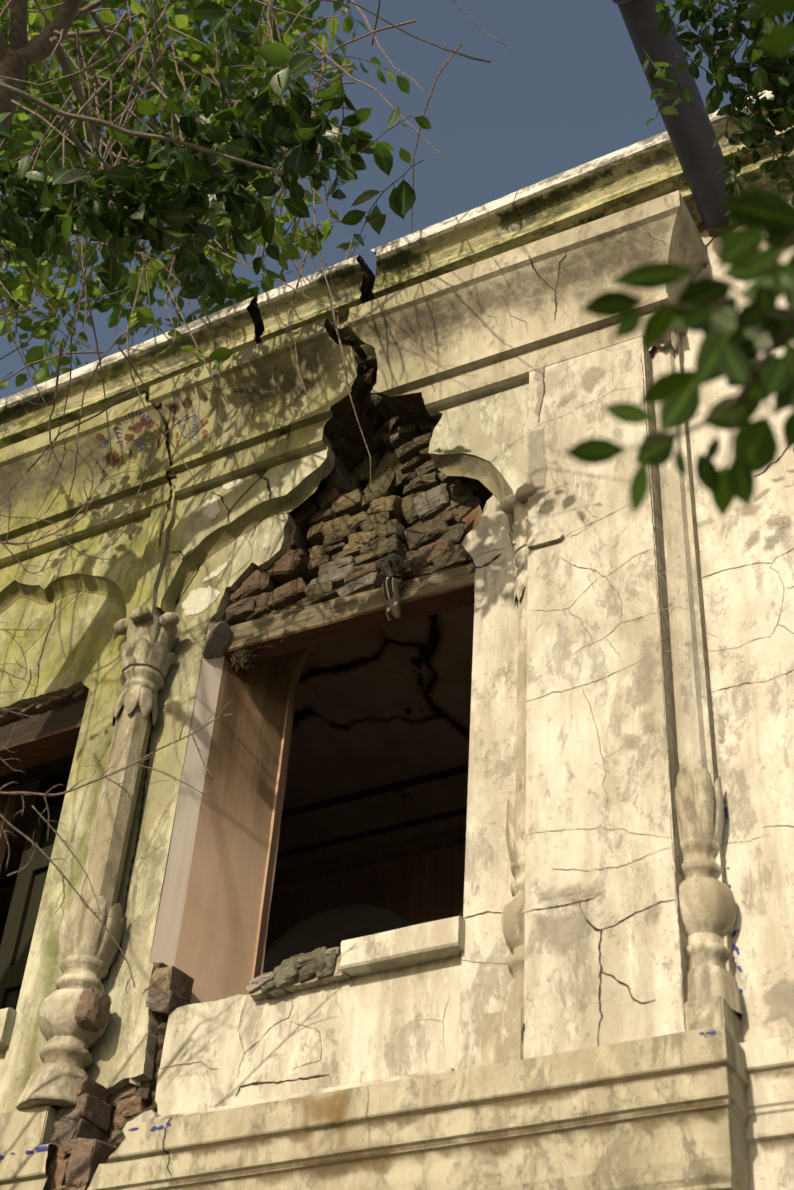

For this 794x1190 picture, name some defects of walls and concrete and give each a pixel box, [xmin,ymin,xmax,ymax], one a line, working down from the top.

crack [500,340,648,453]
crack [146,396,272,612]
spalling [182,322,493,665]
crack [292,548,503,741]
crack [459,467,794,1046]
crack [160,993,329,1096]
spalling [246,947,352,1001]
crack [163,1118,172,1176]